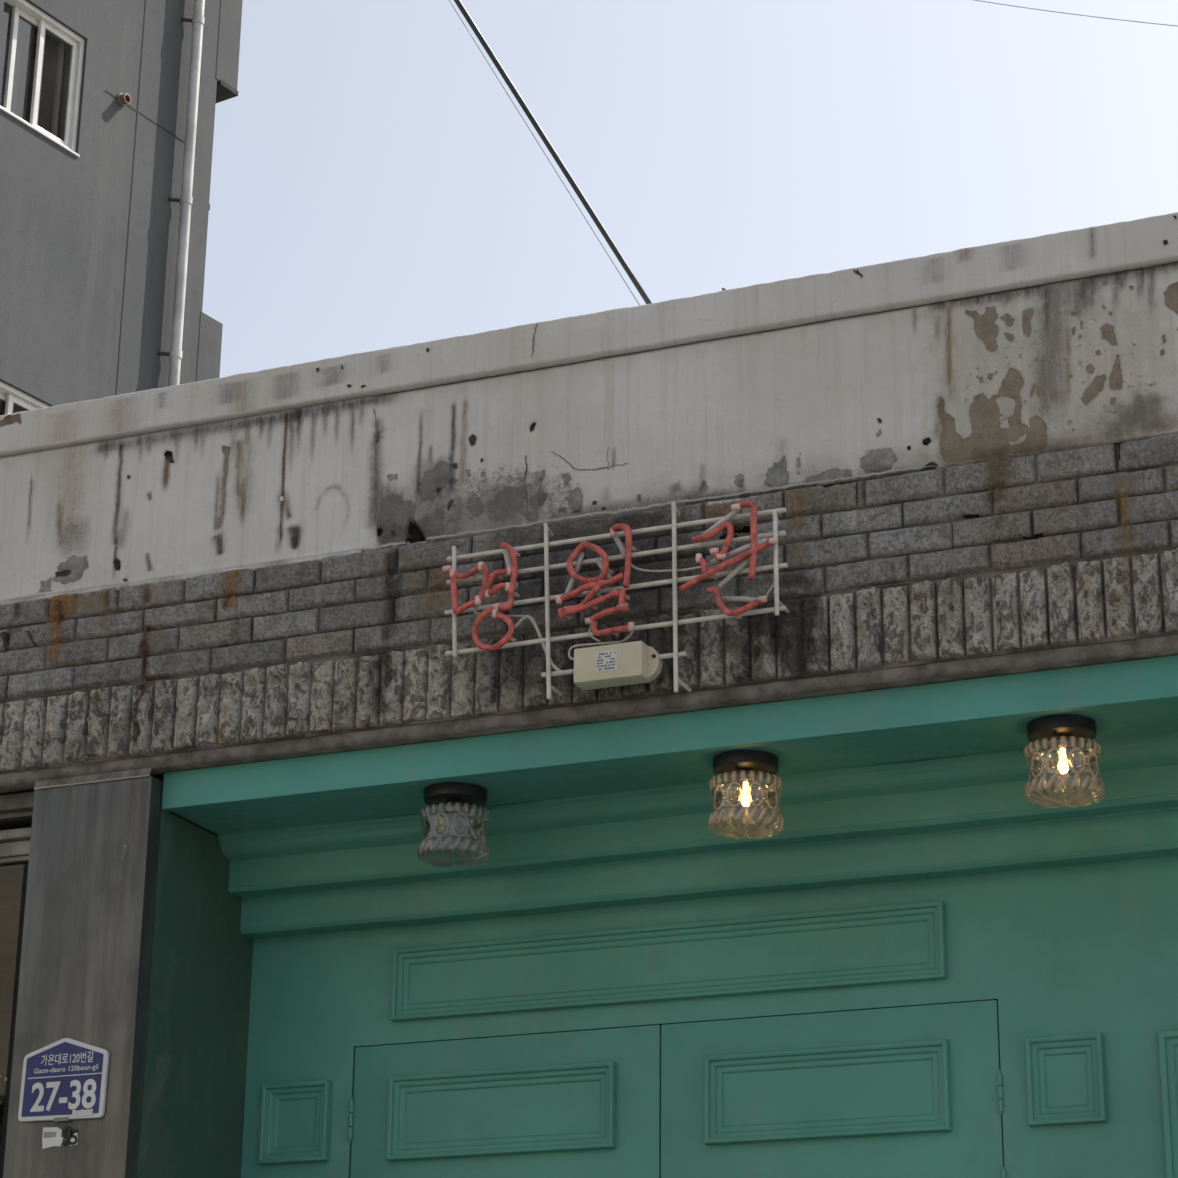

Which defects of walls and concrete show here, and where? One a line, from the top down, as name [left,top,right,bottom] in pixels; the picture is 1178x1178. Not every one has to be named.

peeling [1164,282,1178,314]
peeling [0,414,21,426]
peeling [921,303,1156,471]
damp [370,405,897,707]
rust [48,593,76,662]